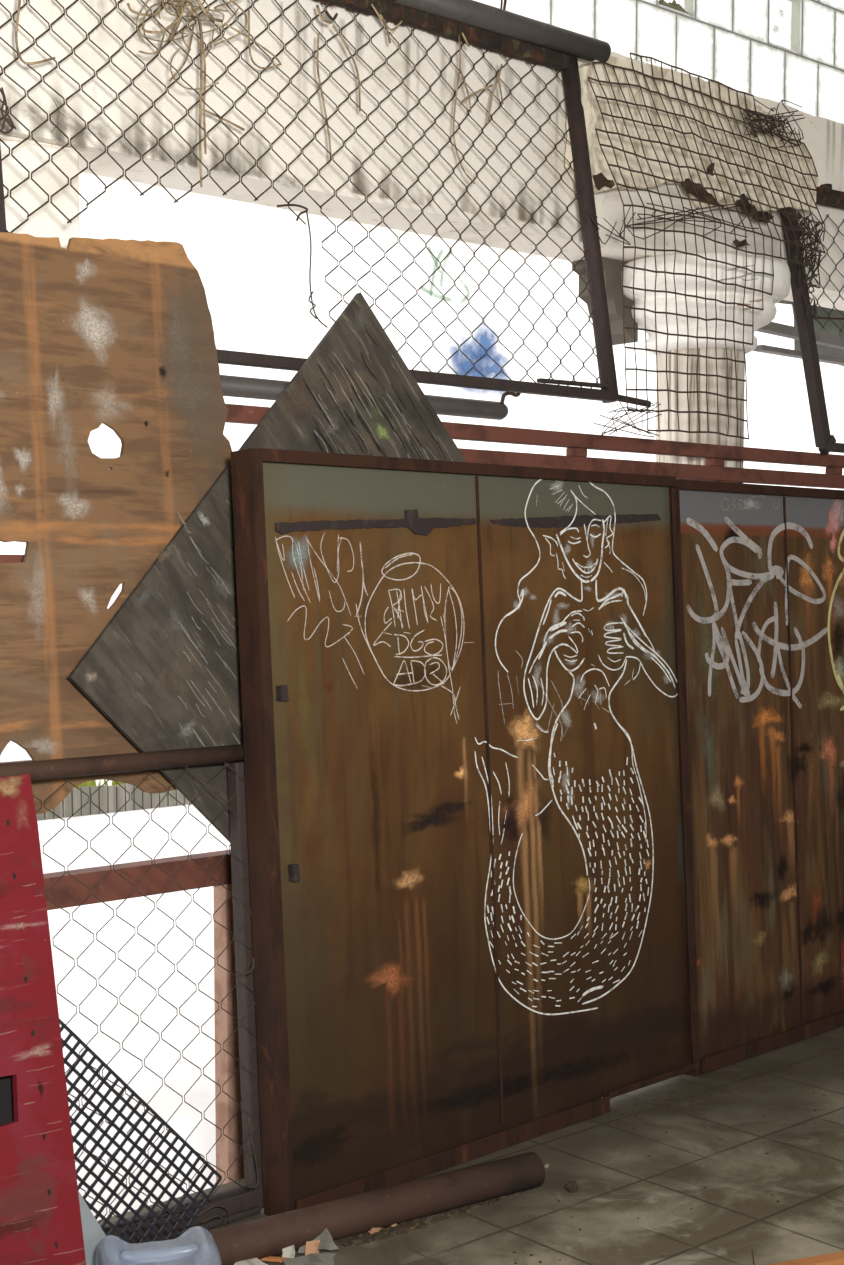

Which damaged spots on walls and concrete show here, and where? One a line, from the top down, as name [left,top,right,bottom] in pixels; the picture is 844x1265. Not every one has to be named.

peeling [592,172,615,190]
peeling [681,162,801,228]
corrosion [757,710,783,765]
corrosion [807,732,835,818]
corrosion [708,836,736,890]
corrosion [782,888,797,927]